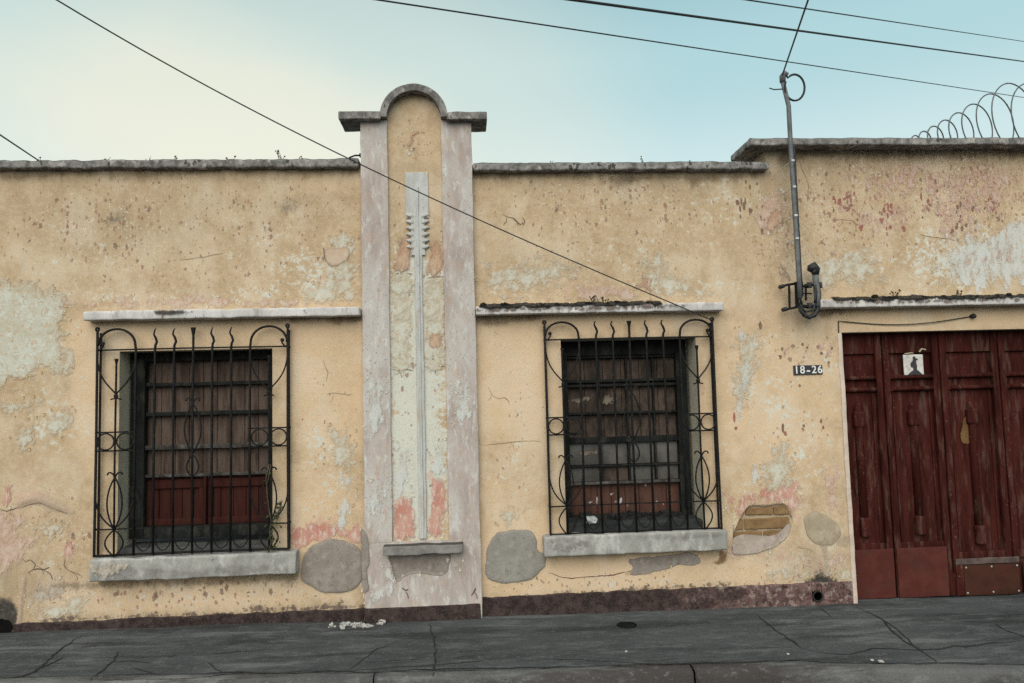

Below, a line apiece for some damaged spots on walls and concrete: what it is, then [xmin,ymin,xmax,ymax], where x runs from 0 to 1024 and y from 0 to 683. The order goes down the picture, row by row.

peeling [475,250,714,303]
peeling [920,173,1024,293]
peeling [0,277,76,453]
peeling [290,229,448,550]
spalling [724,423,803,558]
crack [21,558,81,580]
crack [1,608,1024,680]